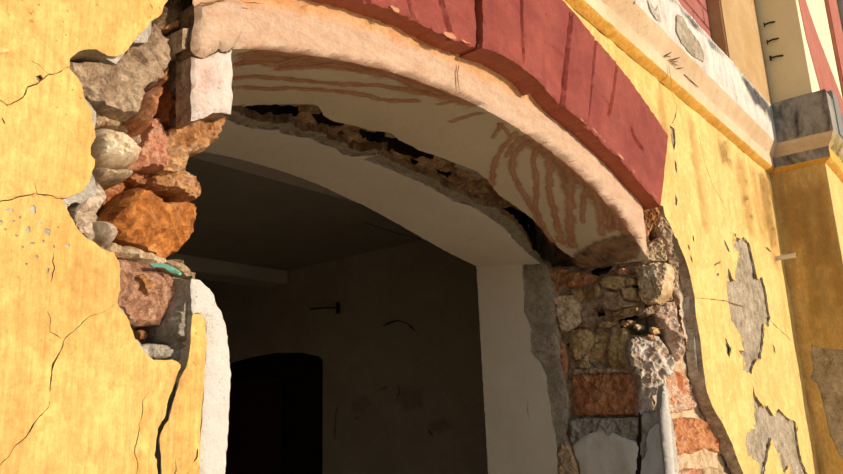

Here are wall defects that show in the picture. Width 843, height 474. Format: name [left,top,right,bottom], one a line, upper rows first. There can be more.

crack [3,67,68,123]
spalling [67,0,226,362]
spalling [547,193,726,474]
peeling [714,235,775,373]
crack [155,382,177,474]
peeling [746,396,806,474]
peeling [810,345,843,458]